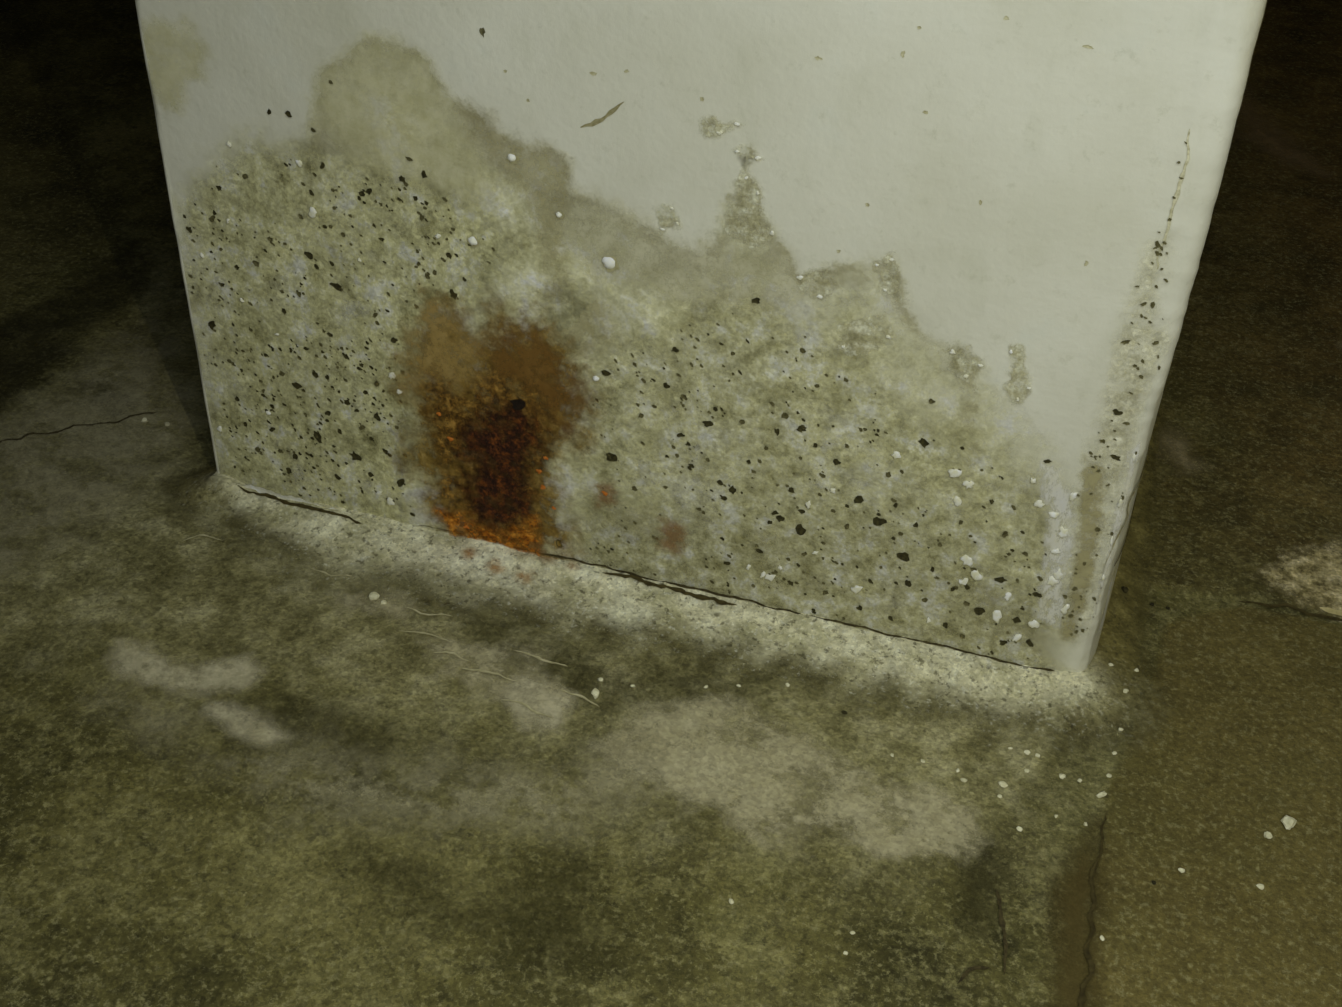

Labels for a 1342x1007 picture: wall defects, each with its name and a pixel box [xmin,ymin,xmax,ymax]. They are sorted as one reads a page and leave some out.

peeling [725,147,776,248]
spalling [183,141,500,521]
rust [399,297,592,560]
spalling [583,218,1172,668]
crack [1106,450,1148,566]
damp [114,643,282,743]
damp [345,591,599,727]
damp [596,697,1008,984]